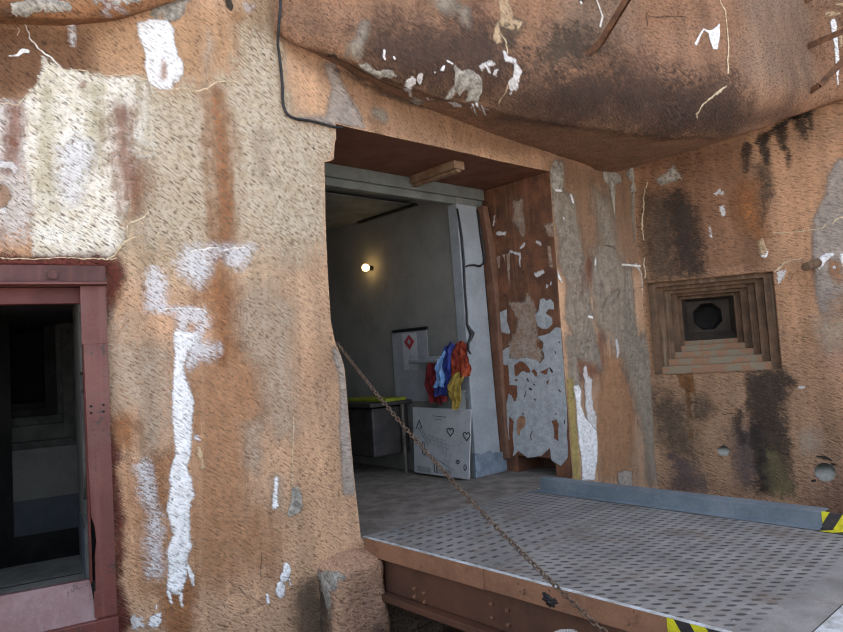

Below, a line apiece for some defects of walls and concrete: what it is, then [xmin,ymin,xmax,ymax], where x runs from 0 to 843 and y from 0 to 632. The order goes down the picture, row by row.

damp [0,0,756,287]
damp [741,110,815,192]
peeling [496,199,525,282]
peeling [534,222,554,278]
damp [758,238,768,258]
rust [127,84,275,632]
peeling [500,295,568,466]
damp [552,168,708,494]
damp [732,369,805,497]